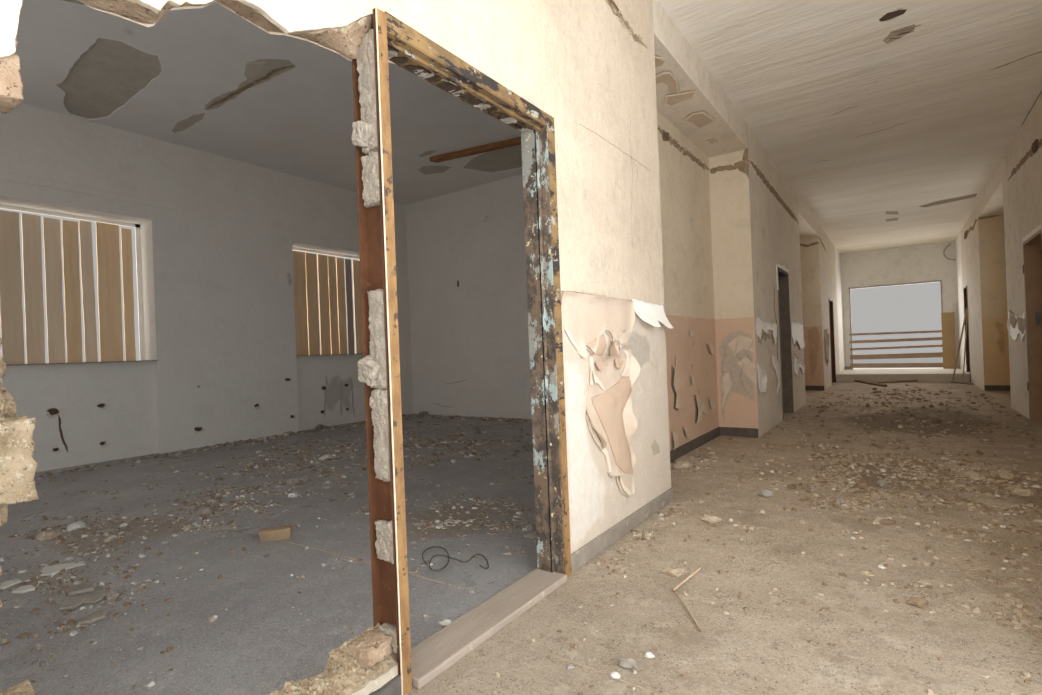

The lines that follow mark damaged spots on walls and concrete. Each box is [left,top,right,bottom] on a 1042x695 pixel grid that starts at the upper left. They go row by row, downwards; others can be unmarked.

spalling [63,0,372,59]
crack [605,0,648,49]
spalling [0,34,24,114]
flaking render [57,38,162,119]
spalling [172,59,296,133]
crack [566,103,653,304]
crack [657,125,826,251]
crack [1008,138,1042,180]
peeling [791,321,805,376]
spalling [0,338,65,526]
peeling [561,291,673,497]
spalling [268,622,402,695]